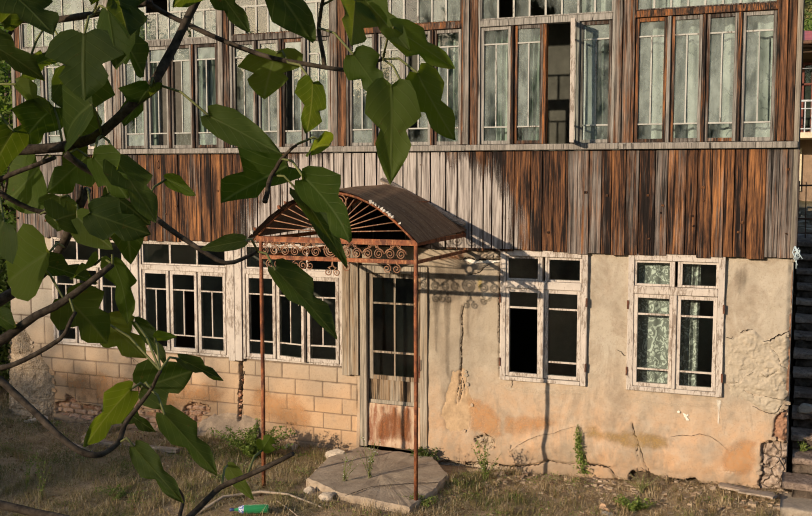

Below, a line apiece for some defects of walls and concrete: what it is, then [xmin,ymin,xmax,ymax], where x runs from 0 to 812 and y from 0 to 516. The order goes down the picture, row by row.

crack [432,254,513,396]
spalling [6,322,102,420]
flaking render [134,400,163,428]
flaking render [183,401,211,428]
crack [237,360,246,419]
corrosion [378,407,409,439]
flaking render [753,270,793,489]